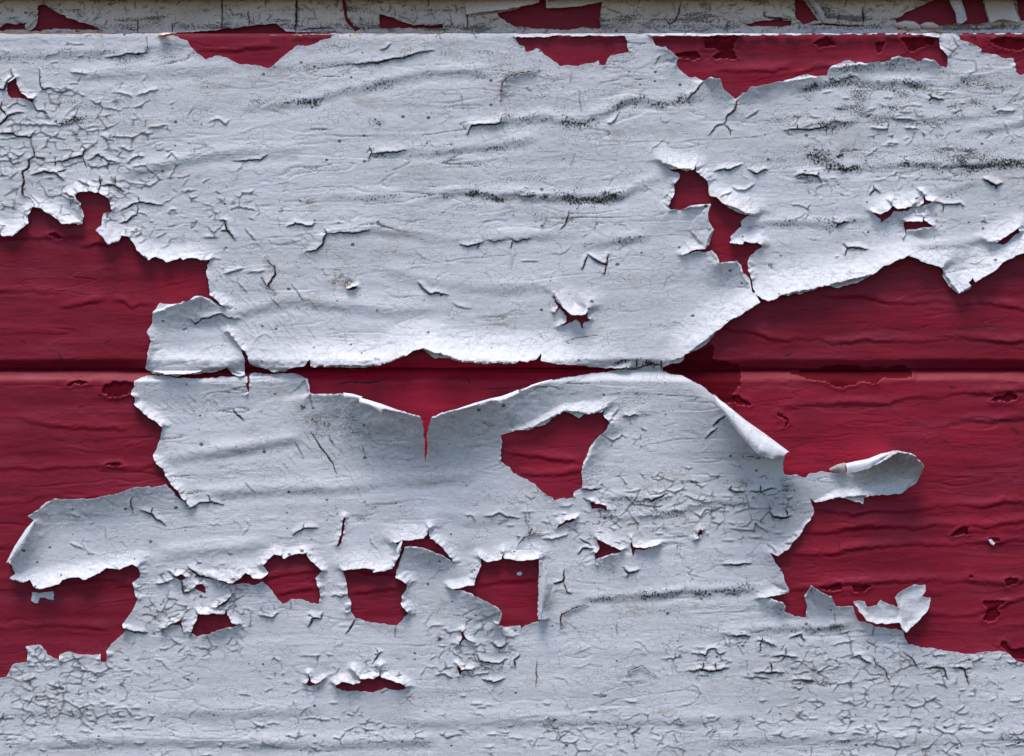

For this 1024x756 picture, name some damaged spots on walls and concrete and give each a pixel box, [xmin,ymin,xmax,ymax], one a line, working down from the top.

peeling [155,18,339,75]
peeling [465,0,1024,106]
crack [0,70,156,224]
peeling [0,186,637,685]
peeling [657,157,1024,670]
crack [477,642,537,683]
crack [689,634,804,674]
crack [856,652,972,684]